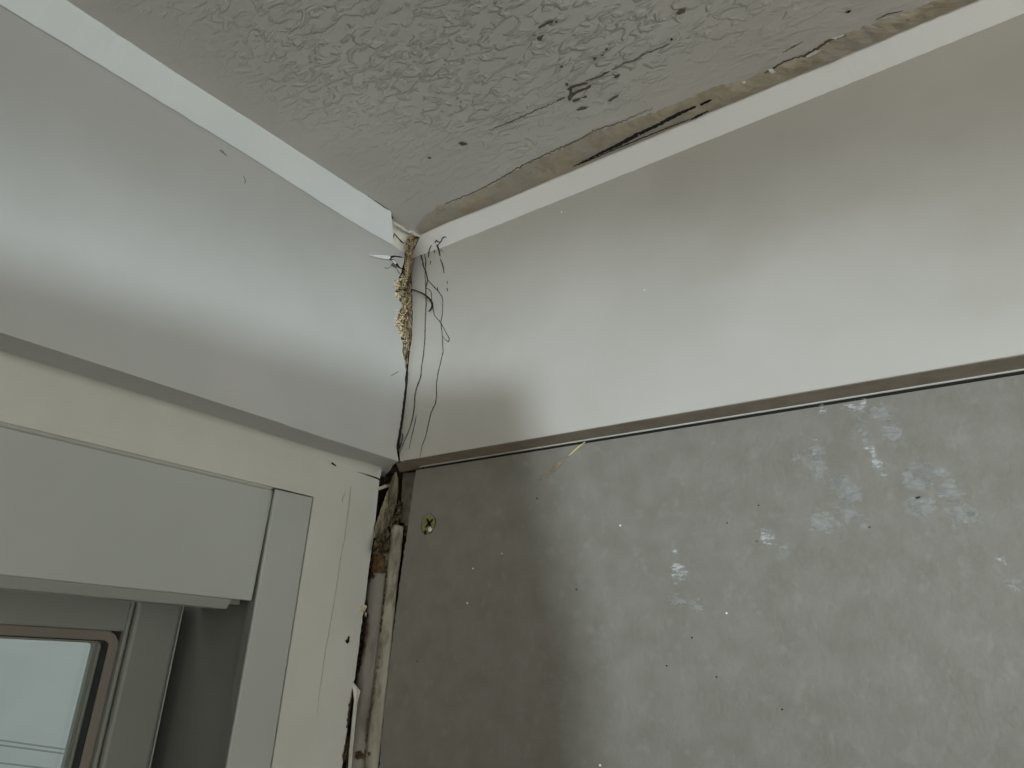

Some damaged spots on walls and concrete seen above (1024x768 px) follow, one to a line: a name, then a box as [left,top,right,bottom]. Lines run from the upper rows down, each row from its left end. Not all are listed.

peeling [764,35,847,74]
peeling [557,71,620,111]
crack [445,99,712,204]
crack [368,196,450,455]
spalling [373,501,408,555]